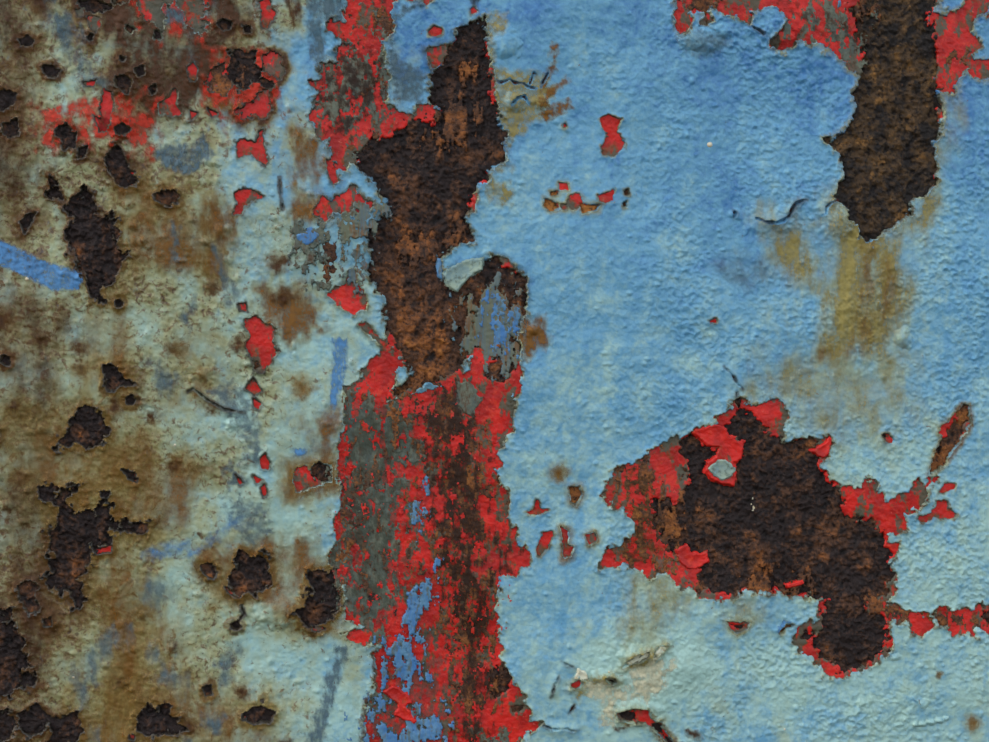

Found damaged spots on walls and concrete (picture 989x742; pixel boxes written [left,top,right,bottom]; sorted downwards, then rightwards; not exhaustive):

corrosion [32,0,289,128]
corrosion [289,127,325,221]
peeling [544,183,628,213]
peeling [600,115,624,157]
peeling [674,0,989,242]
corrosion [0,117,275,742]
corrosion [254,284,323,344]
peeling [282,0,573,742]
corrosion [818,193,940,402]
corrosion [194,536,344,637]
peeling [598,397,989,678]
peeling [617,709,672,742]